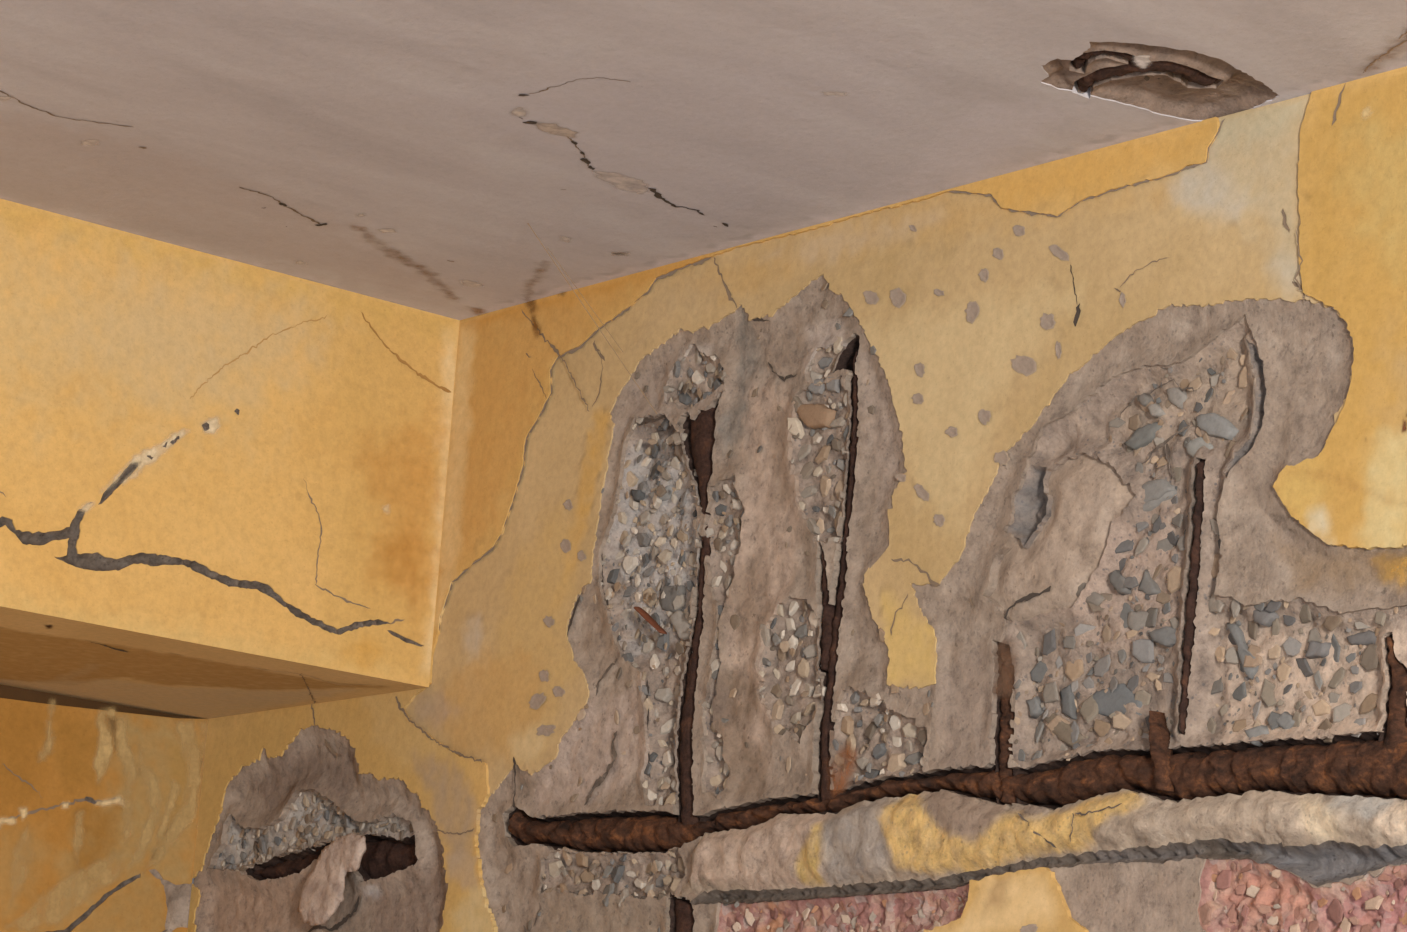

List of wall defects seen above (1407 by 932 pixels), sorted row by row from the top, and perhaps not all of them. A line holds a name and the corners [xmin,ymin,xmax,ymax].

crack [0,91,132,127]
corrosion [1072,50,1234,93]
crack [1332,31,1407,125]
crack [512,77,768,322]
crack [362,313,451,393]
crack [522,311,605,411]
crack [0,315,424,647]
flaking render [405,42,1407,932]
corrosion [508,351,1407,854]
spalling [149,726,448,932]
crack [46,874,140,932]
corrosion [675,899,695,932]